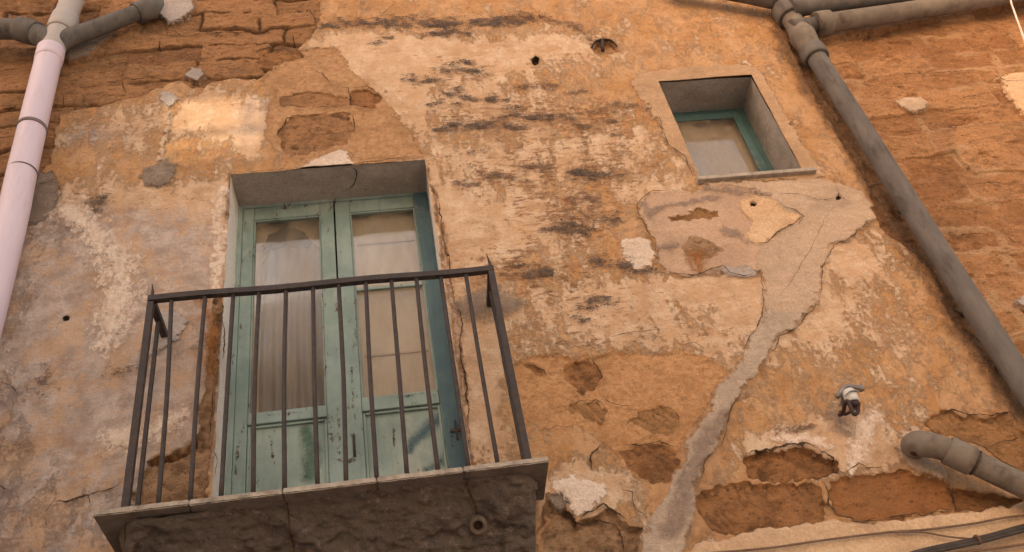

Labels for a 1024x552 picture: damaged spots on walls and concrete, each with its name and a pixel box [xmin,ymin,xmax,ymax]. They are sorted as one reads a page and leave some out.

flaking render [0,0,59,27]
flaking render [0,40,36,194]
flaking render [39,0,474,465]